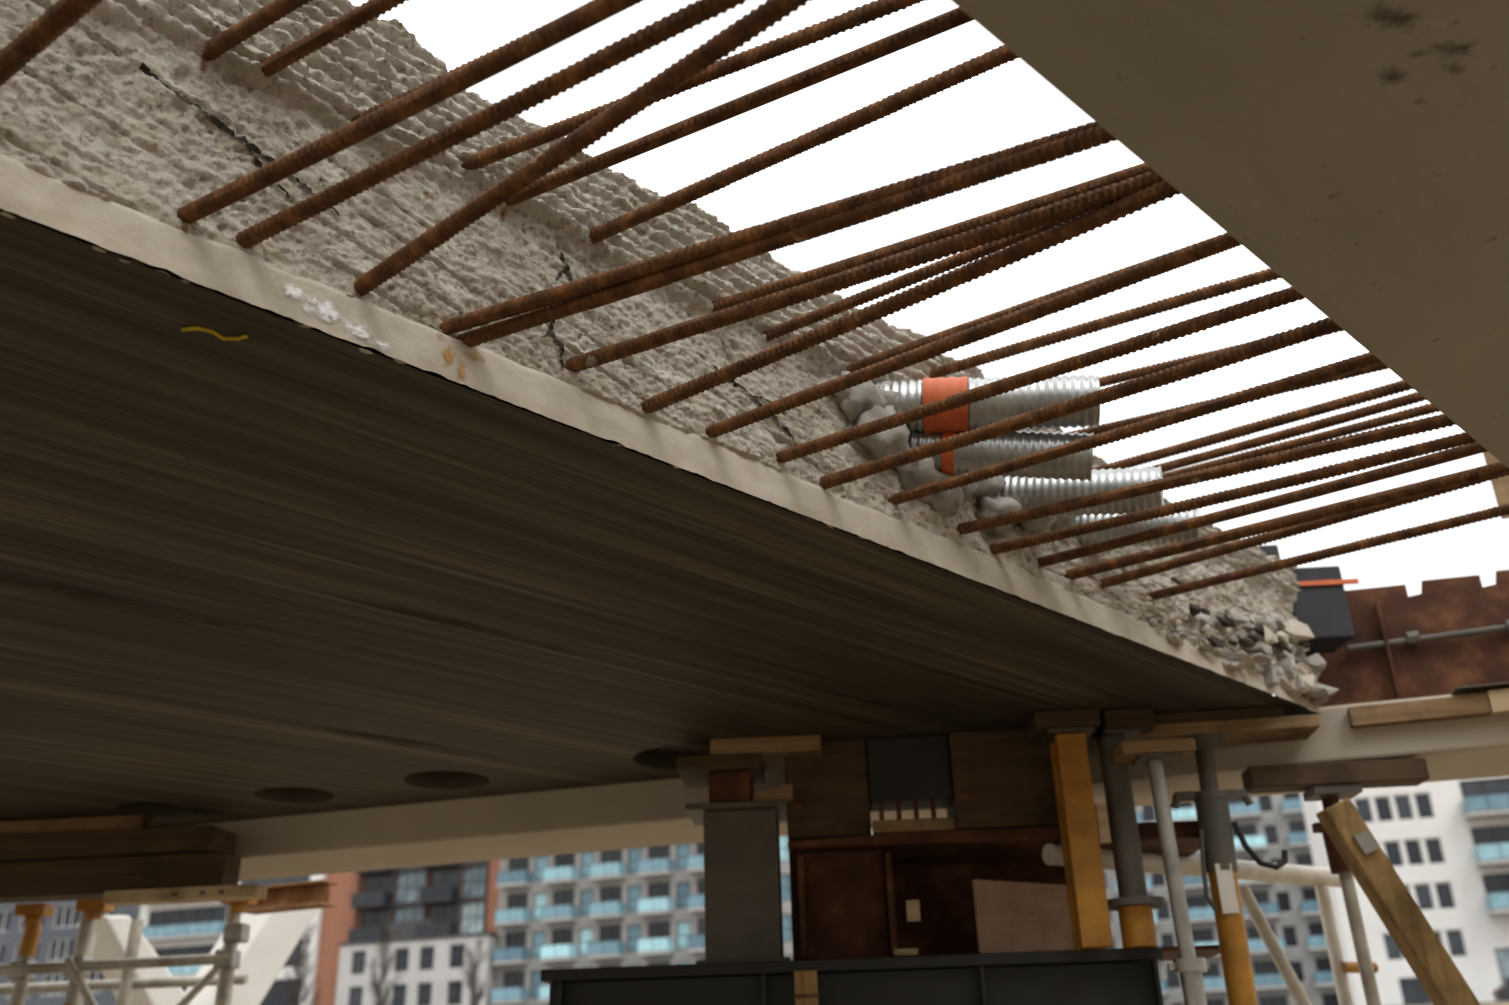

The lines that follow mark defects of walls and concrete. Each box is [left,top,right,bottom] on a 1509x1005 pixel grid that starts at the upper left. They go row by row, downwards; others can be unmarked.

spalling [0,0,103,87]
spalling [91,246,215,293]
crack [139,62,340,217]
spalling [359,348,412,369]
spalling [177,0,1019,297]
spalling [440,122,1117,347]
spalling [565,163,1181,413]
spalling [705,232,1509,706]